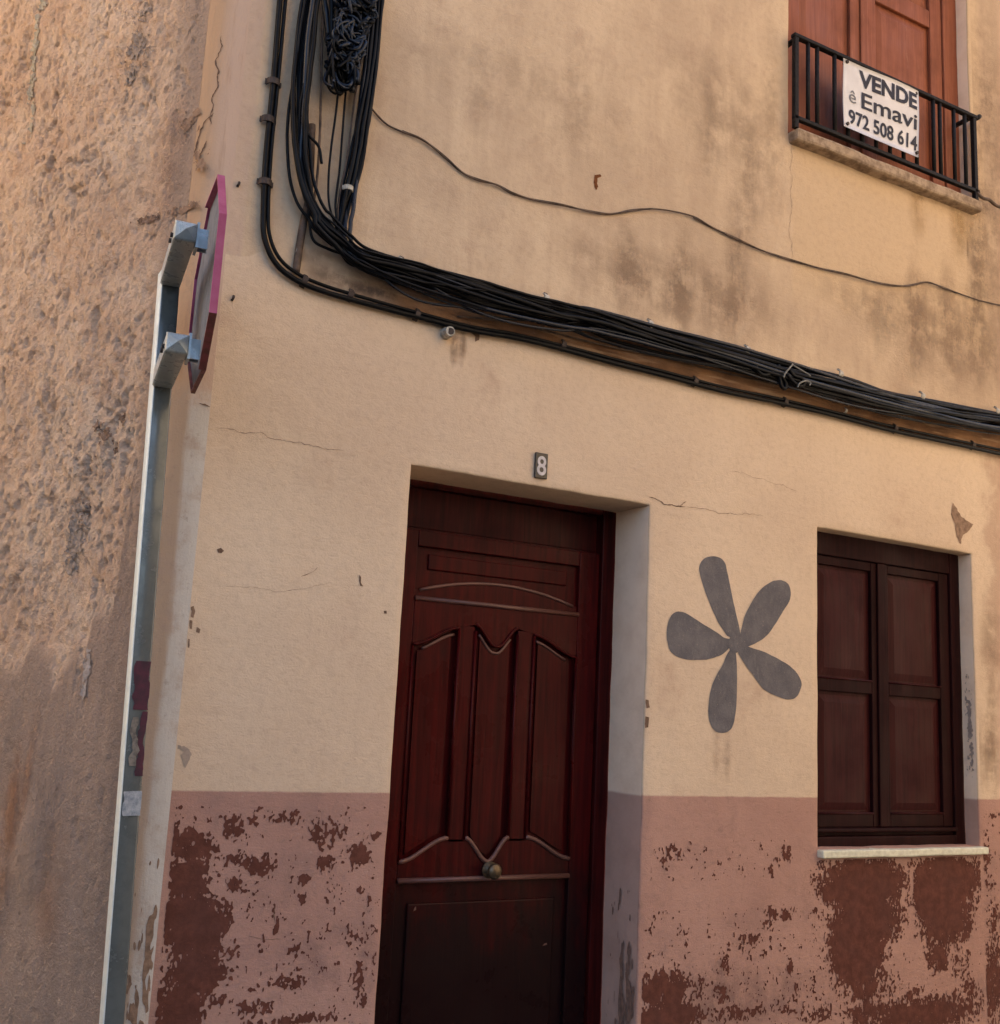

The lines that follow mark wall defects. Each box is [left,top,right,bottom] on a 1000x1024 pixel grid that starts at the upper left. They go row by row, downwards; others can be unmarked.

crack [194,37,223,160]
crack [650,497,762,516]
peeling [951,504,973,544]
peeling [126,805,382,1024]
peeling [606,813,1000,1024]